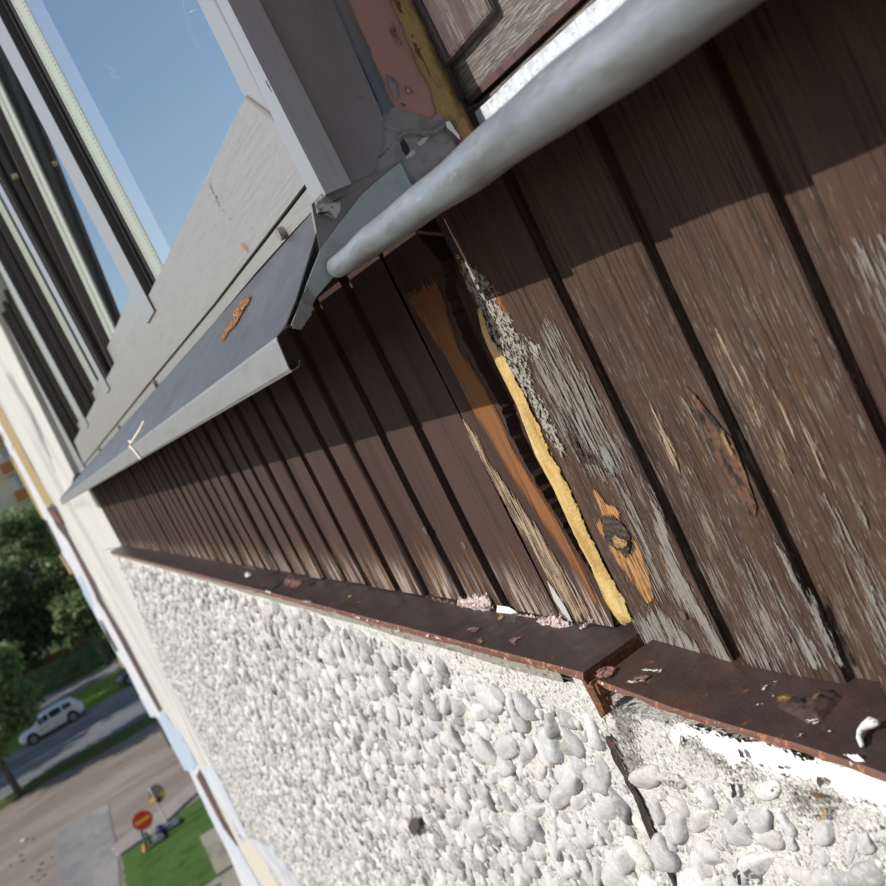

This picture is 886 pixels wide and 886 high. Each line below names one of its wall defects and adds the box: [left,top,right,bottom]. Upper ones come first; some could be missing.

peeling [454,253,848,696]
crack [606,736,655,840]
crack [667,872,677,886]